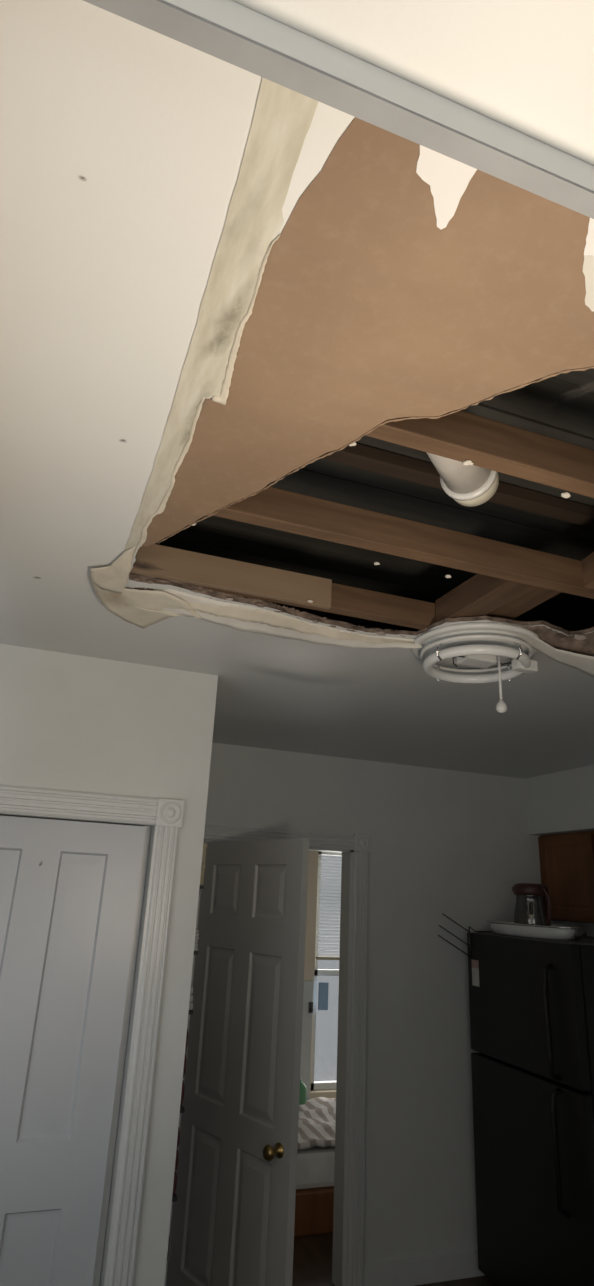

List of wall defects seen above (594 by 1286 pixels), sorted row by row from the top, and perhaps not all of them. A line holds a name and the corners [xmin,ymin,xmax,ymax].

peeling [90,117,594,649]
peeling [516,634,594,677]